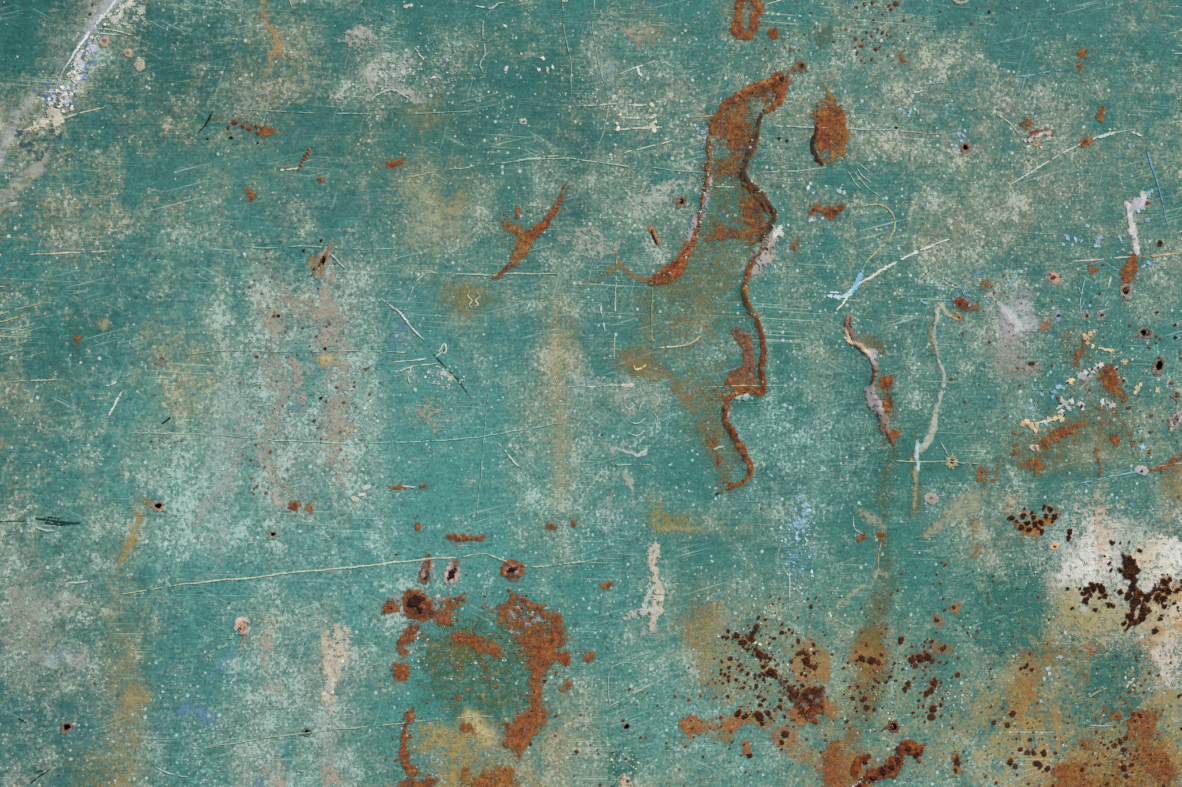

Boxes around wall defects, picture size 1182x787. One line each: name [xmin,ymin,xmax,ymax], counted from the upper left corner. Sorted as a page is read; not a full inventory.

rust [724,0,800,52]
rust [832,0,926,63]
rust [810,86,851,165]
rust [492,184,566,279]
rust [612,71,798,495]
rust [1068,291,1107,366]
rust [990,348,1182,492]
rust [1005,498,1059,540]
rust [380,588,647,787]
rust [667,539,1182,787]